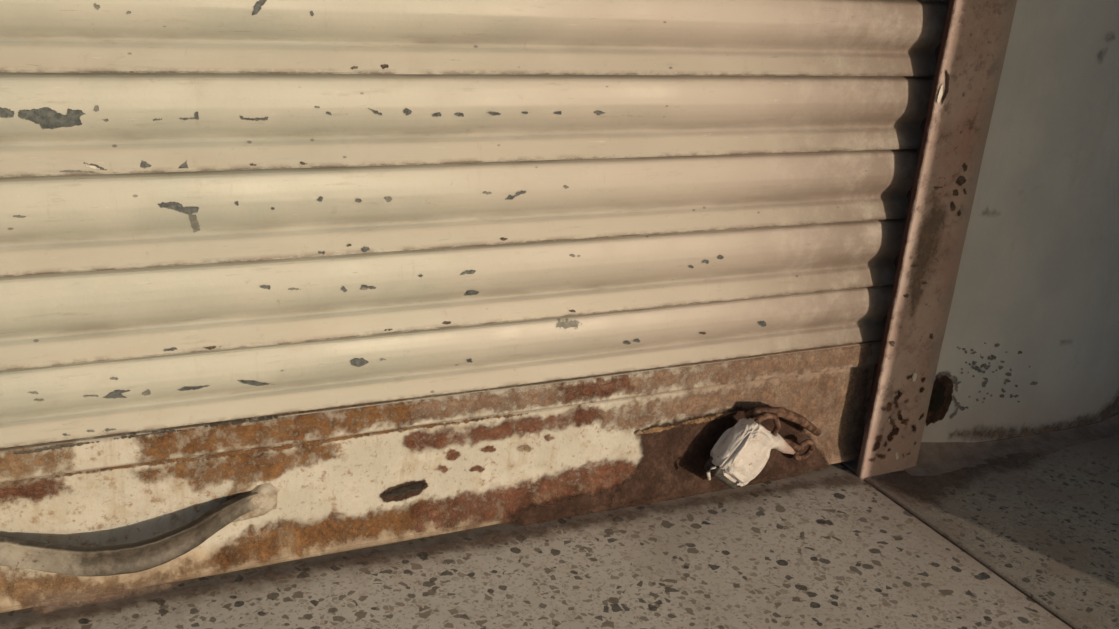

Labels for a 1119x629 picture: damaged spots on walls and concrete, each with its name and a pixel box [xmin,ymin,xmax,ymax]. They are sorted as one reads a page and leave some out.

peeling [0,105,109,129]
flaking render [926,372,960,426]
peeling [380,480,428,502]
rust [0,343,924,614]